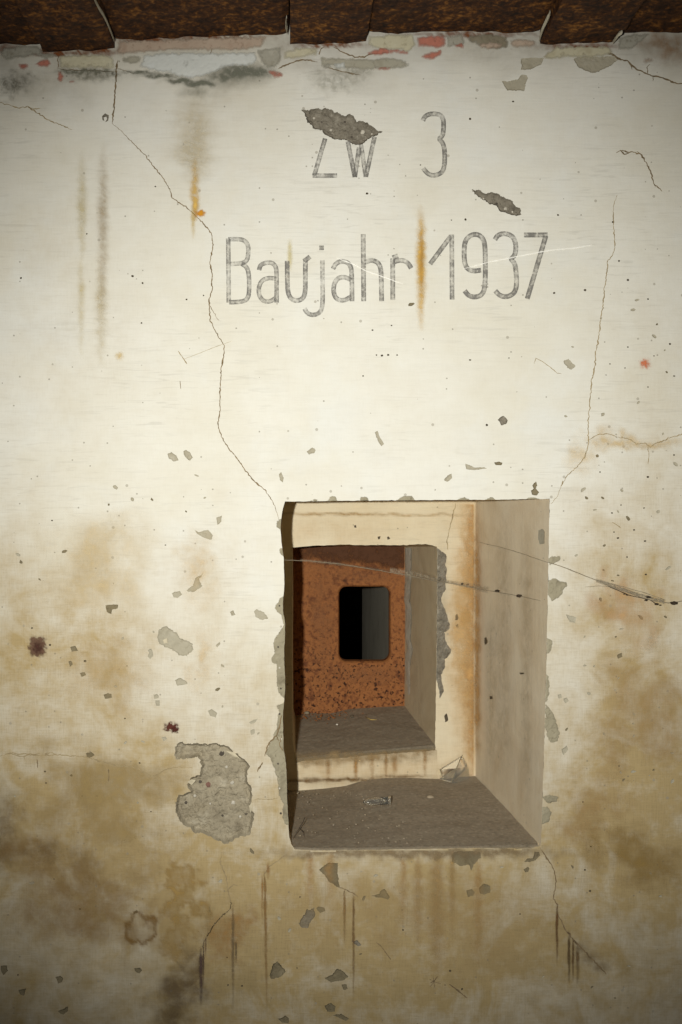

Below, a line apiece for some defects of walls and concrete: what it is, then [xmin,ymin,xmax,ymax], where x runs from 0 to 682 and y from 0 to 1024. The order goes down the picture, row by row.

flaking render [419,36,462,59]
peeling [480,40,544,102]
peeling [574,56,617,73]
flaking render [302,108,383,145]
corrosion [185,137,205,219]
flaking render [472,189,521,216]
crack [57,56,279,519]
corrosion [417,228,425,308]
crack [552,196,682,503]
peeling [148,626,194,659]
flaking render [161,737,255,844]
crack [540,848,606,974]